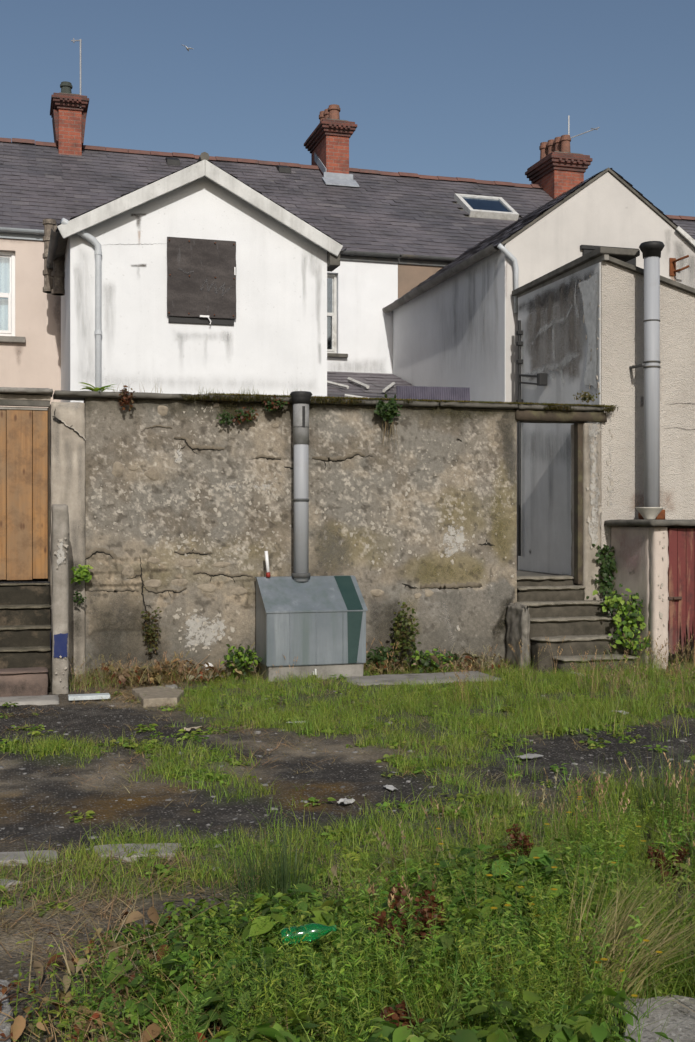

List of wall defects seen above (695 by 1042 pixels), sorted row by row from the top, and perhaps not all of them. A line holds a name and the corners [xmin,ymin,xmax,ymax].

leakage [527,280,582,376]
crack [52,409,86,440]
crack [141,425,225,453]
crack [254,451,370,470]
crack [85,547,253,632]